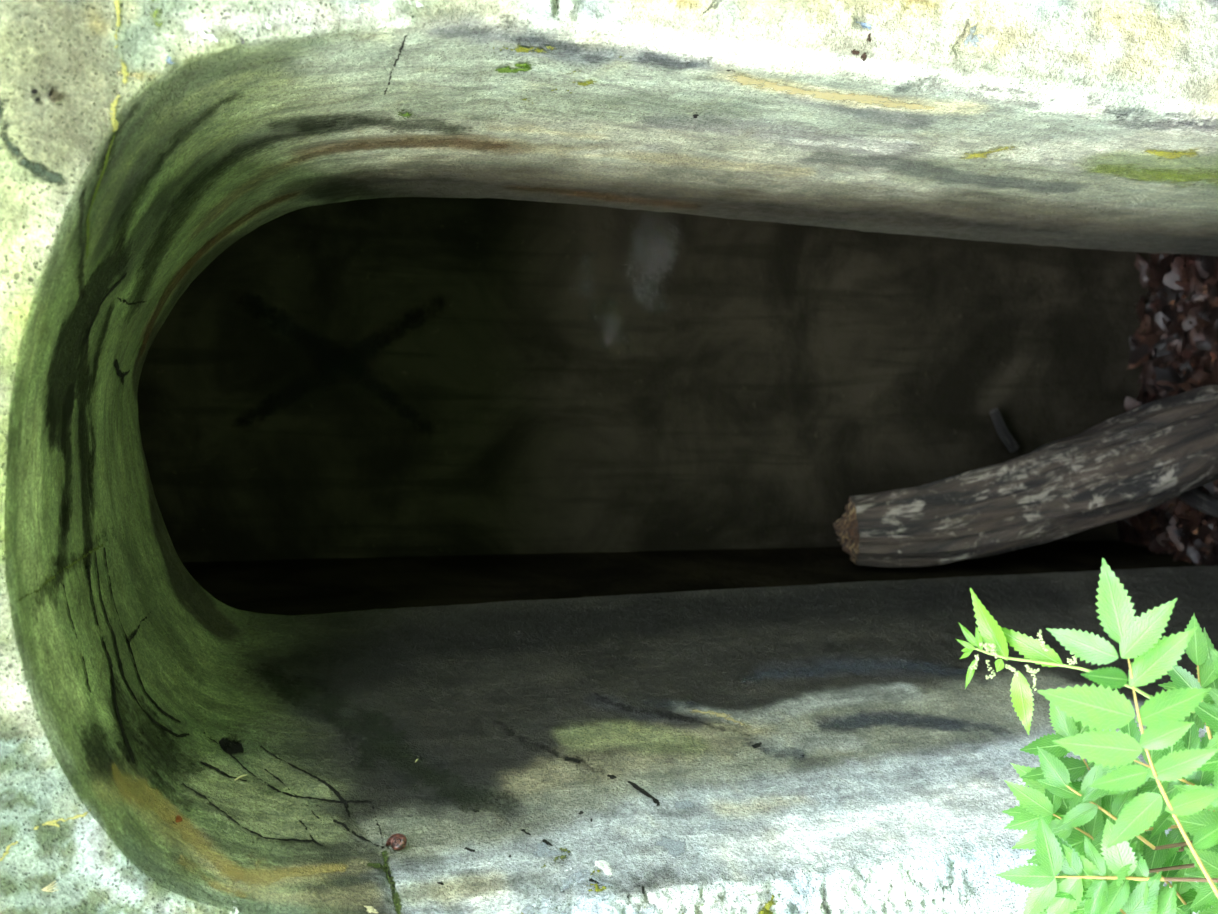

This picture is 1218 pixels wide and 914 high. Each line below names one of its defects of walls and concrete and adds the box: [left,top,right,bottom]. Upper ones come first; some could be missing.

crack [384,0,414,94]
damp [44,94,471,584]
crack [19,537,402,914]